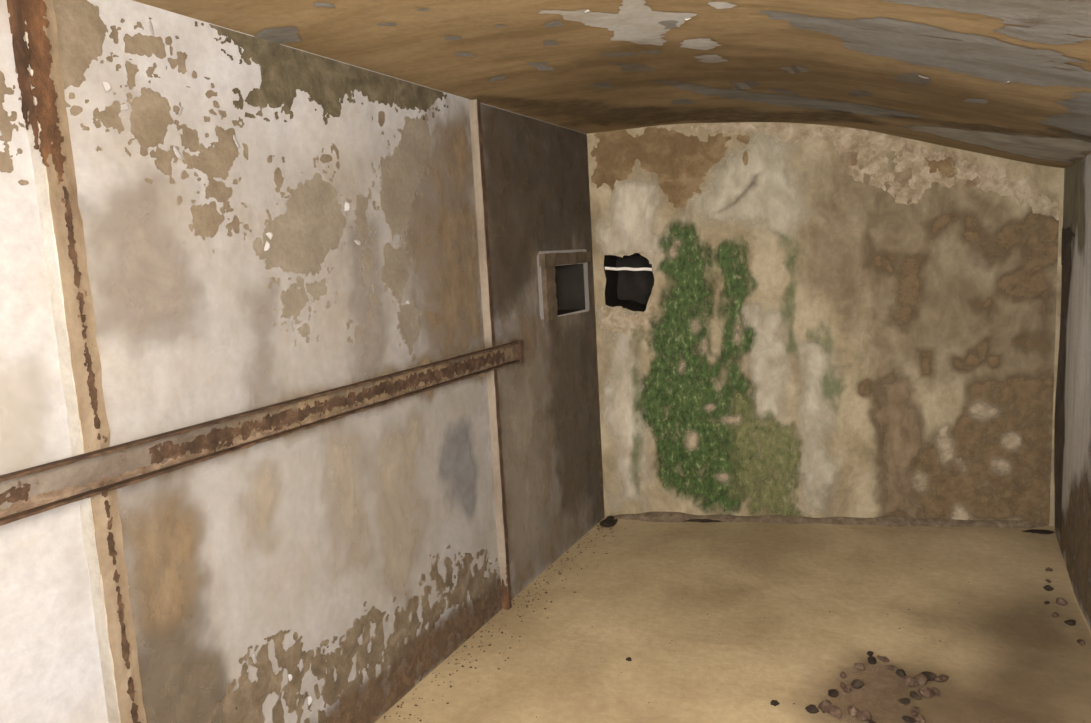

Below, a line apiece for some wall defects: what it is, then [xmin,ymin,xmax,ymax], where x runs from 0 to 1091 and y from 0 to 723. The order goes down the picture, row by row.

peeling [0,67,29,185]
corrosion [0,483,31,505]
corrosion [6,0,101,440]
corrosion [102,491,141,723]
leakage [118,418,500,723]
corrosion [149,337,516,477]
leakage [195,21,926,598]
peeling [539,0,1091,265]
leakage [858,338,1091,625]
leakage [929,159,1085,353]